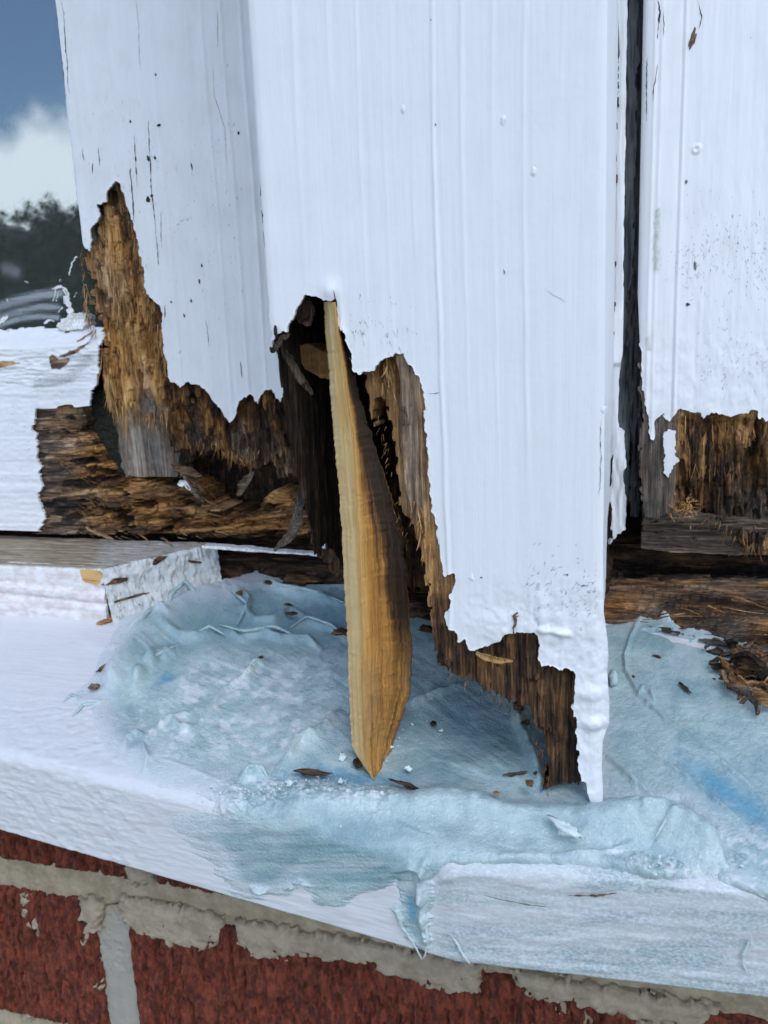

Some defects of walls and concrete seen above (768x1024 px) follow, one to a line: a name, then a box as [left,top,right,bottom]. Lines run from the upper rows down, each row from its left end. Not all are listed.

peeling [49,331,92,369]